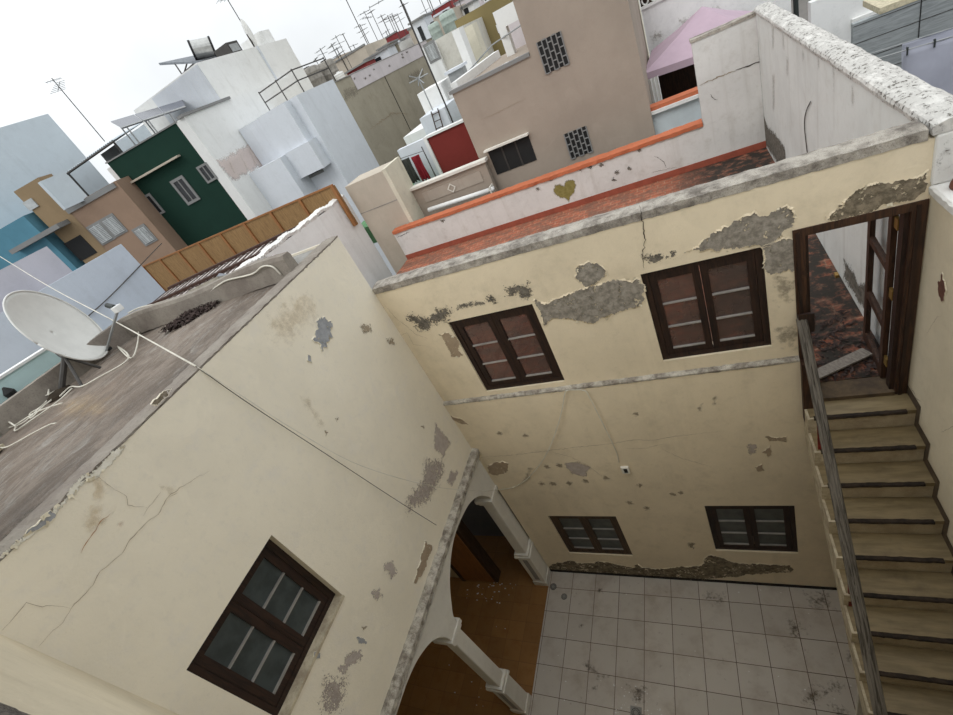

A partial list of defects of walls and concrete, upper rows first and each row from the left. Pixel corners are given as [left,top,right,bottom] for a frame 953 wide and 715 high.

peeling [641,204,798,275]
peeling [825,169,931,222]
peeling [307,316,333,363]
peeling [406,261,646,358]
peeling [25,445,126,536]
peeling [405,424,458,517]
crack [10,473,206,644]
spalling [548,554,794,579]
peeling [318,626,367,715]